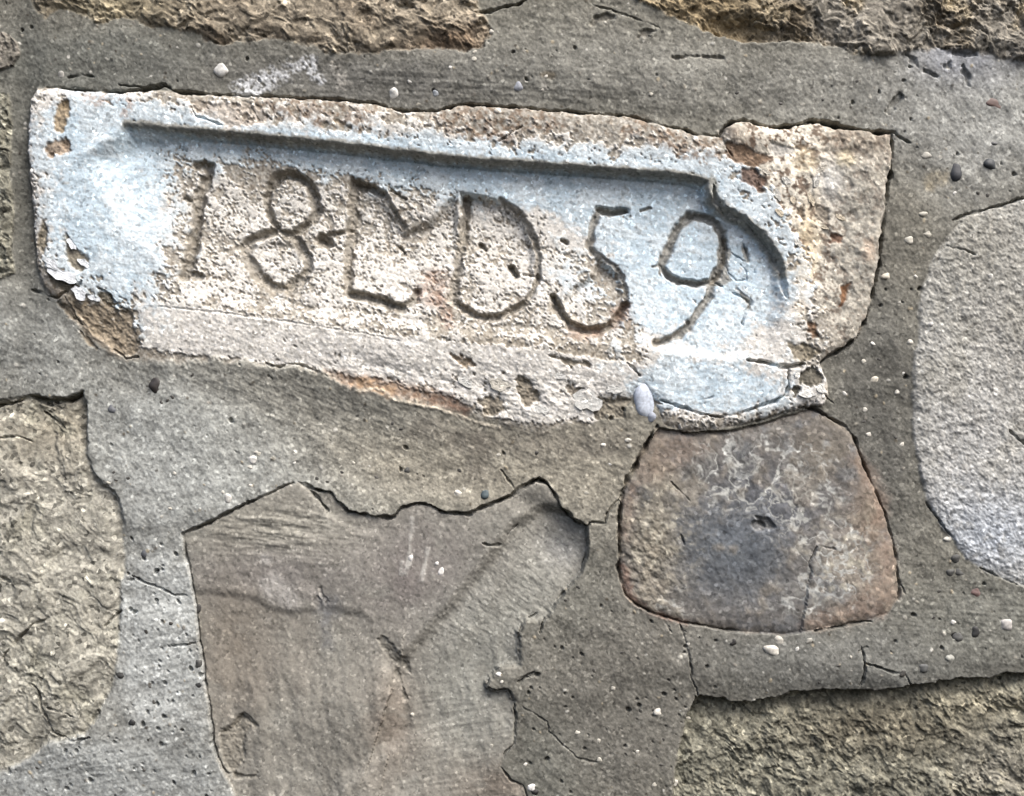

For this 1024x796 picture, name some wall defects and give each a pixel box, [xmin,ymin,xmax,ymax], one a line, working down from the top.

spalling [38,220,142,356]
crack [30,73,912,796]
crack [1,576,12,584]